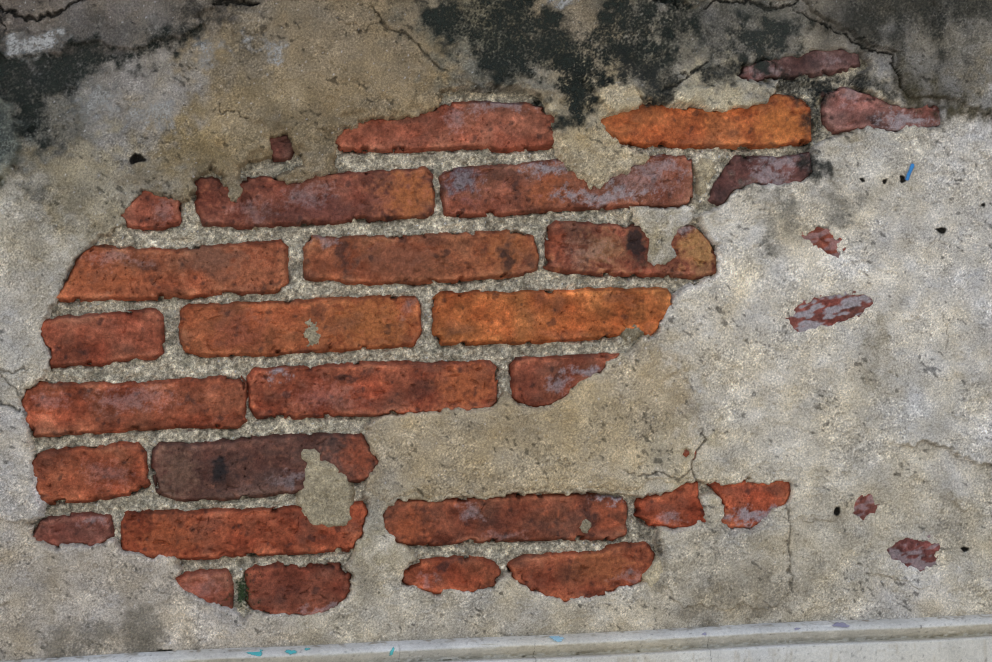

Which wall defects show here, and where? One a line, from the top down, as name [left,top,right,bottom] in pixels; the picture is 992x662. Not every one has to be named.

crack [0,0,83,27]
leakage [0,0,207,149]
flaking render [448,40,545,90]
leakage [422,0,701,129]
crack [664,62,708,91]
crack [704,0,902,88]
spalling [21,49,941,618]
flaking render [0,405,41,523]